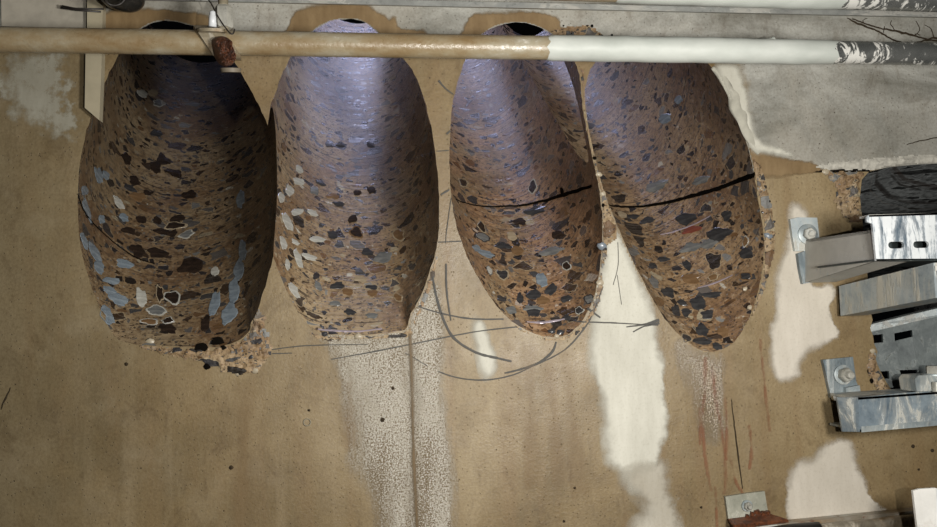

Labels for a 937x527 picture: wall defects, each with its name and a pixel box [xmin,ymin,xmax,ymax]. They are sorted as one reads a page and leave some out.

crack [847,18,937,42]
crack [795,160,870,173]
crack [456,185,591,208]
crack [608,172,755,208]
leakage [770,204,839,381]
leakage [590,234,681,527]
leakage [329,286,452,527]
leakage [786,440,885,519]
corrosion [745,509,771,518]